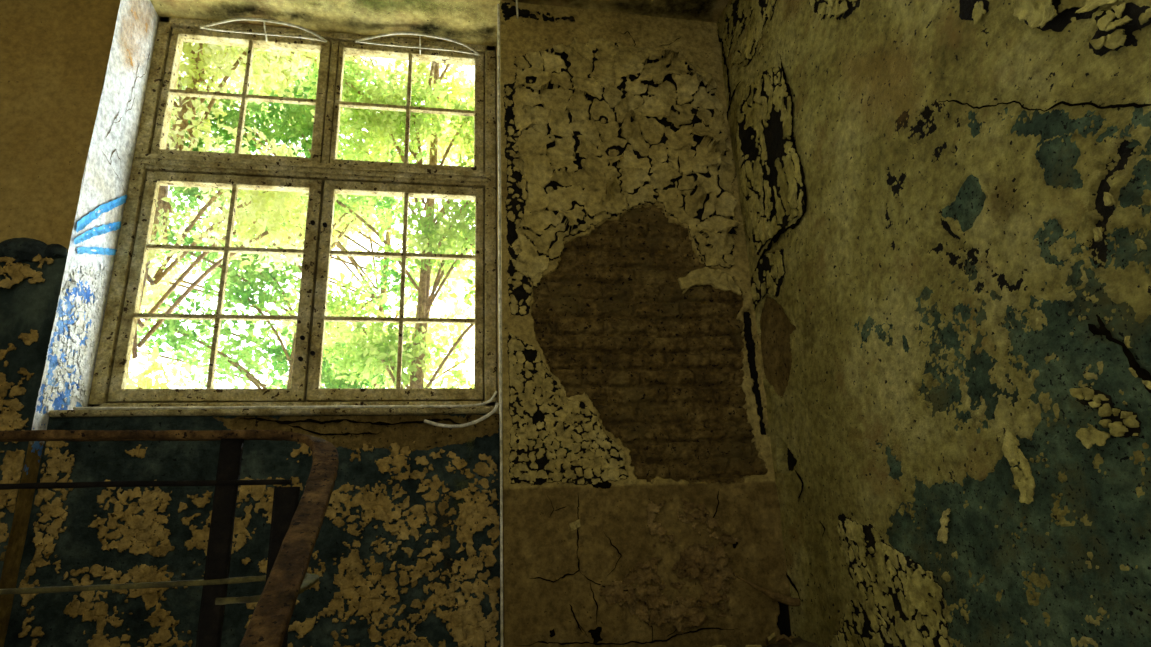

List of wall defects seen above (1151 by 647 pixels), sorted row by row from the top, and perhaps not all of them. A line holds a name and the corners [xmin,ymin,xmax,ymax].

peeling [806,0,861,20]
flaking render [959,0,989,24]
peeling [1013,0,1151,56]
crack [931,100,1151,112]
flaking render [501,0,804,484]
peeling [854,95,1151,647]
crack [1088,314,1151,393]
crack [240,417,460,436]
peeling [0,264,213,647]
peeling [591,479,612,489]
crack [507,332,734,646]